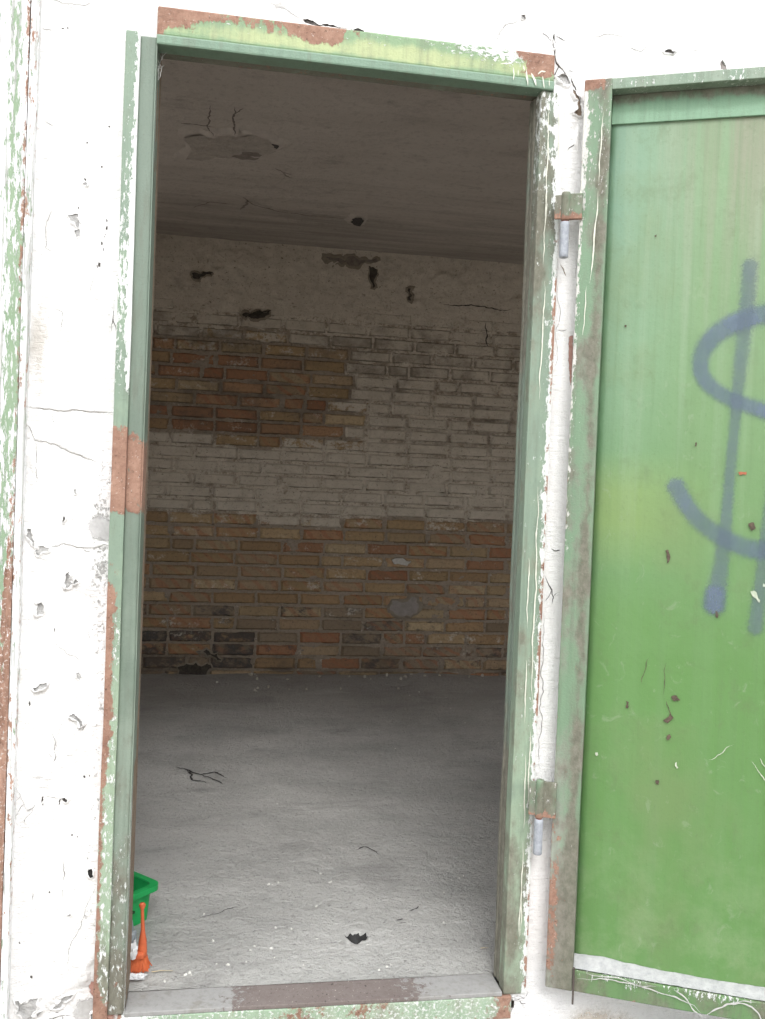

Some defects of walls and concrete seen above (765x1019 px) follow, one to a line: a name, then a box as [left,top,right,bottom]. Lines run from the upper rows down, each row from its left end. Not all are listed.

spalling [301,18,365,32]
crack [543,33,581,106]
crack [181,108,242,136]
crack [27,403,114,483]
crack [177,767,226,783]
peeling [11,991,77,1019]